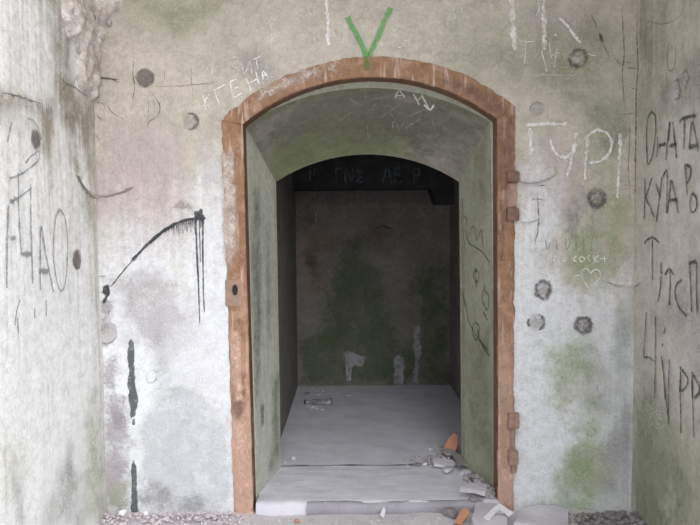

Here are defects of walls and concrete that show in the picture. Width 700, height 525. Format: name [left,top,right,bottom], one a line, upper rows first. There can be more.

spalling [60,0,122,103]
rust [233,331,249,495]